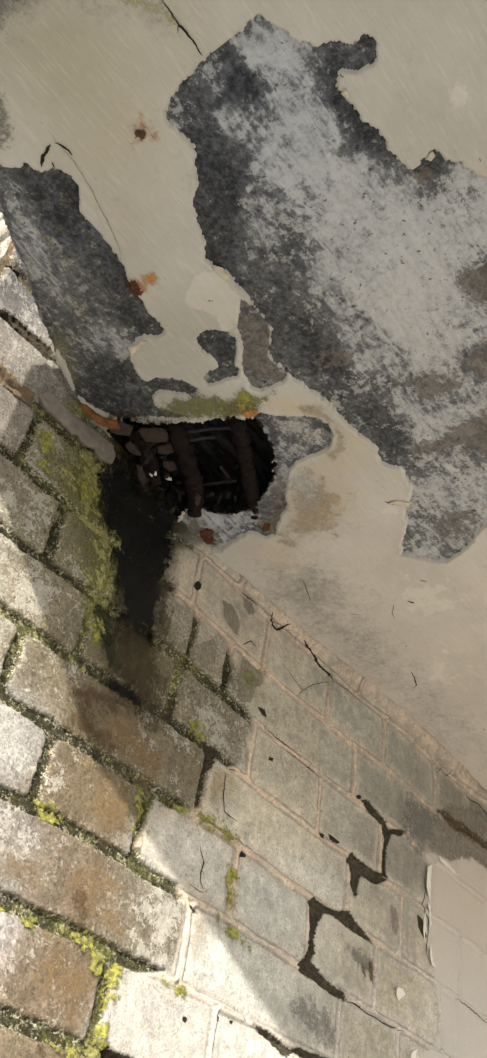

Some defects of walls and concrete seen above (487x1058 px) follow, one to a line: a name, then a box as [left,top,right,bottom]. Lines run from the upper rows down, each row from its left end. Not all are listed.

crack [162,0,203,56]
crack [40,139,122,262]
rust [126,274,157,297]
peeling [0,14,487,560]
water stain [92,437,179,739]
crack [243,593,360,701]
peeling [402,795,487,968]
peeling [352,948,374,981]